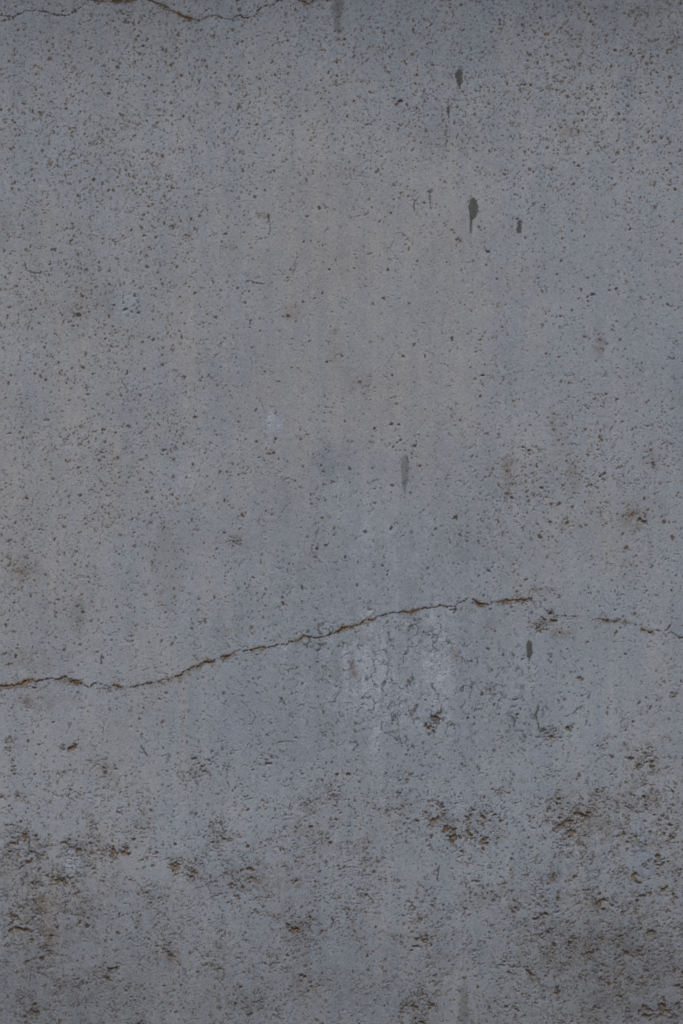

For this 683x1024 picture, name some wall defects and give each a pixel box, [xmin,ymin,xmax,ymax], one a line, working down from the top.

leakage [469,198,478,232]
crack [0,598,576,743]